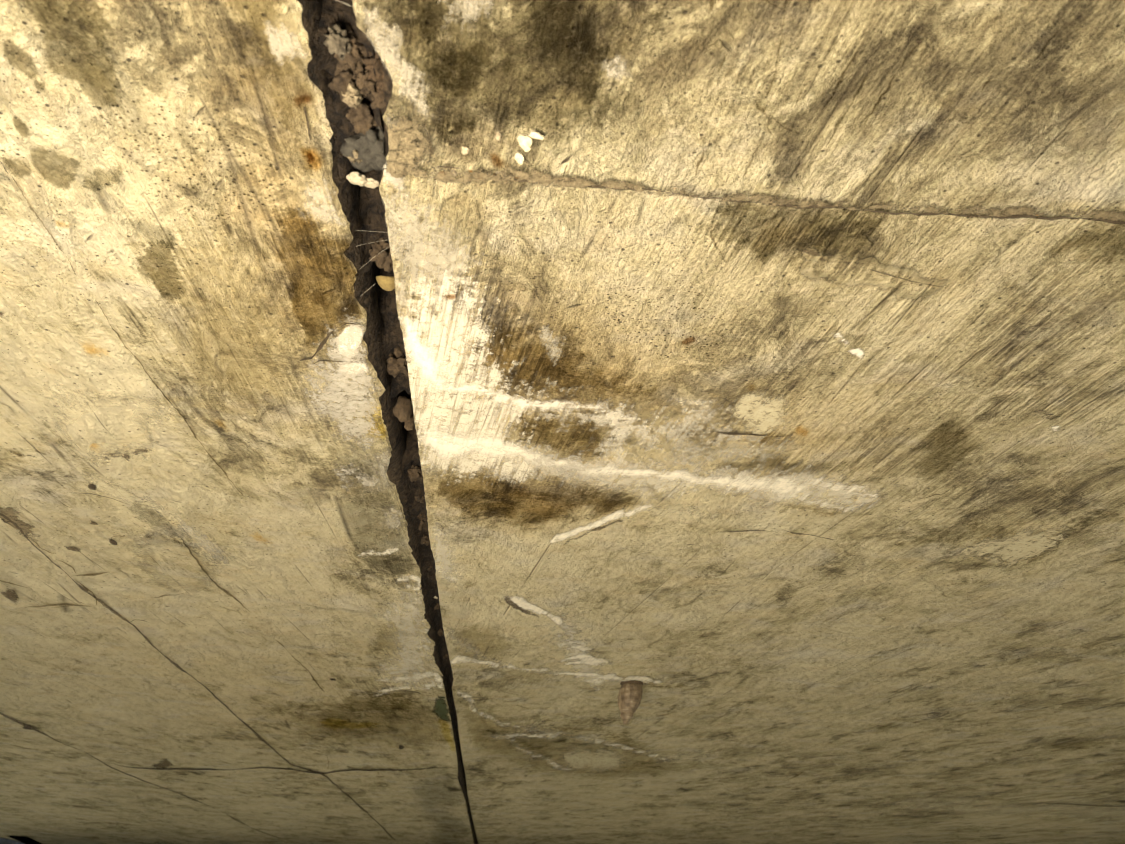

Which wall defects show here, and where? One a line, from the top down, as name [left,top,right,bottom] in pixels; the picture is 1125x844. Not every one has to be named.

crack [588,0,1125,224]
crack [0,161,75,272]
crack [437,155,572,183]
crack [95,299,243,495]
water stain [401,270,875,512]
efflorescence [551,503,719,543]
crack [0,513,438,840]
efflorescence [381,672,443,695]
efflorescence [451,596,661,688]
efflorescence [457,692,663,772]